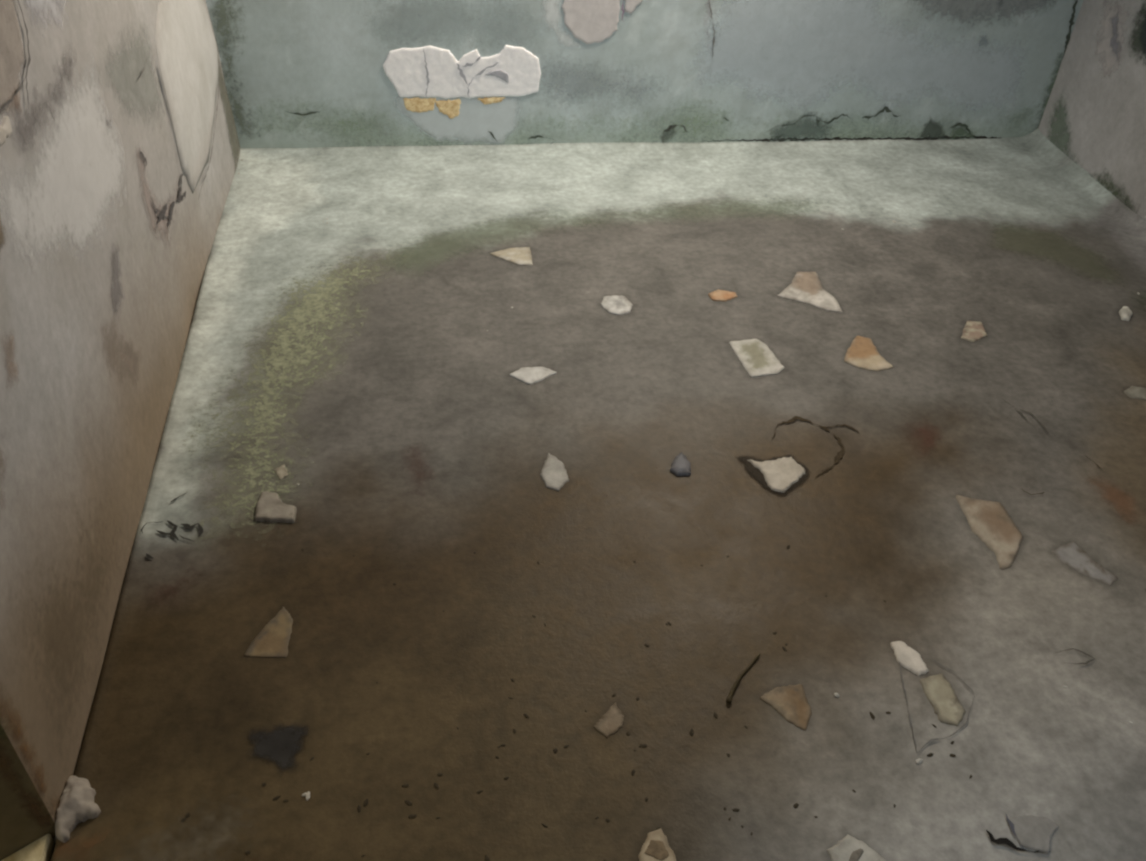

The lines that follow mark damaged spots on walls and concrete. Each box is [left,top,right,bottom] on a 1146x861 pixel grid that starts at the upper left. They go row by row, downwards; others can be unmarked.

peeling [544,0,643,45]
damp [1110,4,1146,58]
flaking render [383,45,541,119]
crack [138,148,186,231]
damp [112,252,122,311]
crack [772,416,859,477]
spalling [249,725,308,769]